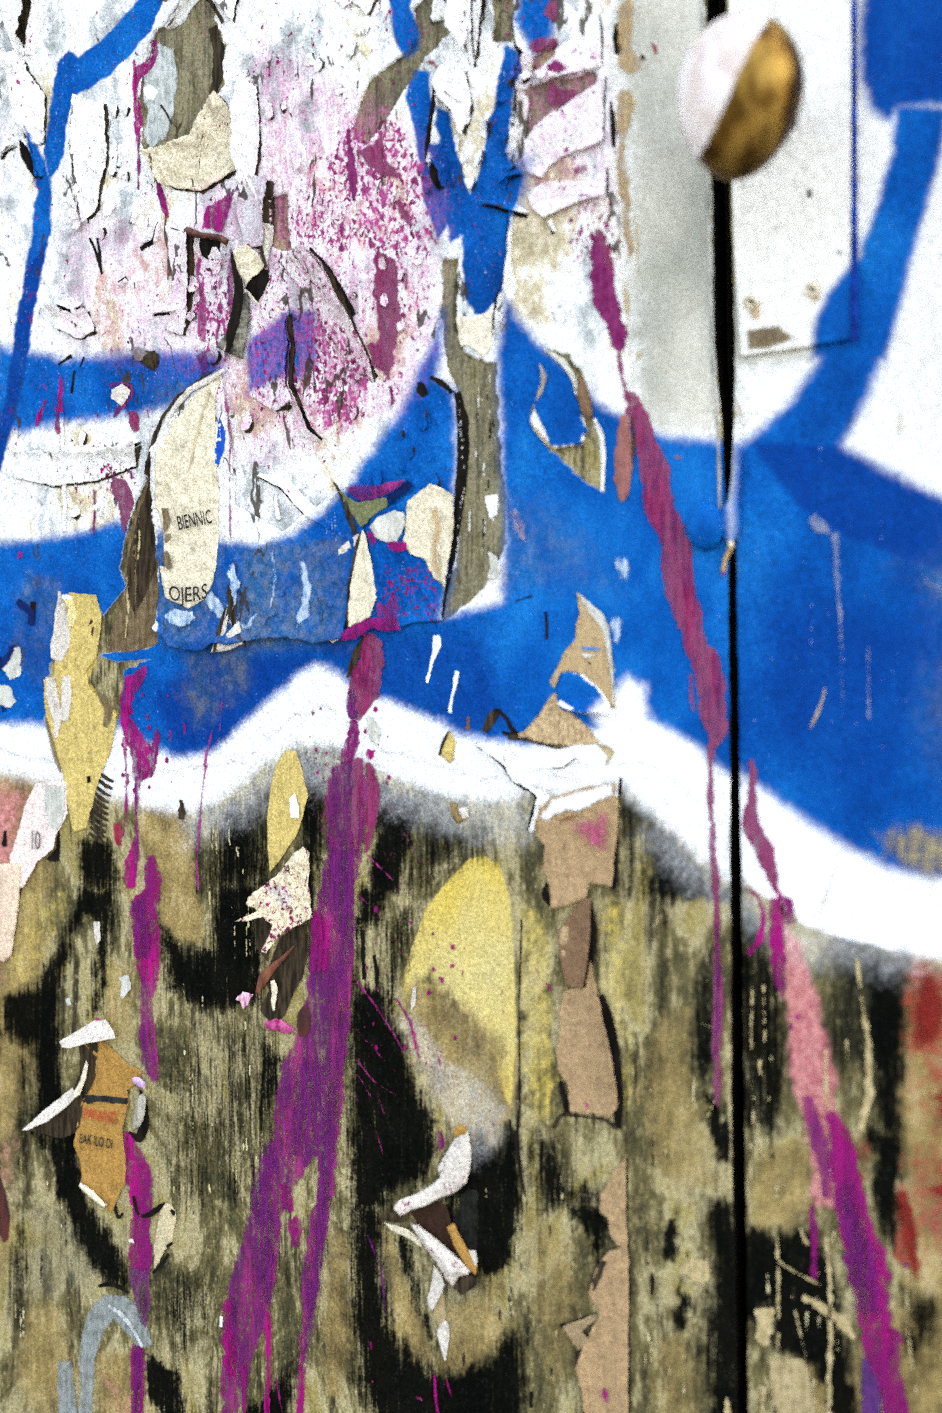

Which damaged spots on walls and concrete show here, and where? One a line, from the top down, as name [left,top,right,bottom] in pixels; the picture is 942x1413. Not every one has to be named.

peeling [208,25,225,95]
peeling [95,43,177,147]
peeling [386,186,396,205]
peeling [181,247,222,292]
peeling [378,255,423,281]
peeling [206,347,226,366]
peeling [241,411,254,433]
peeling [350,404,359,421]
peeling [528,349,606,491]
peeling [508,592,616,766]
peeling [438,709,498,763]
peeling [114,1196,176,1274]